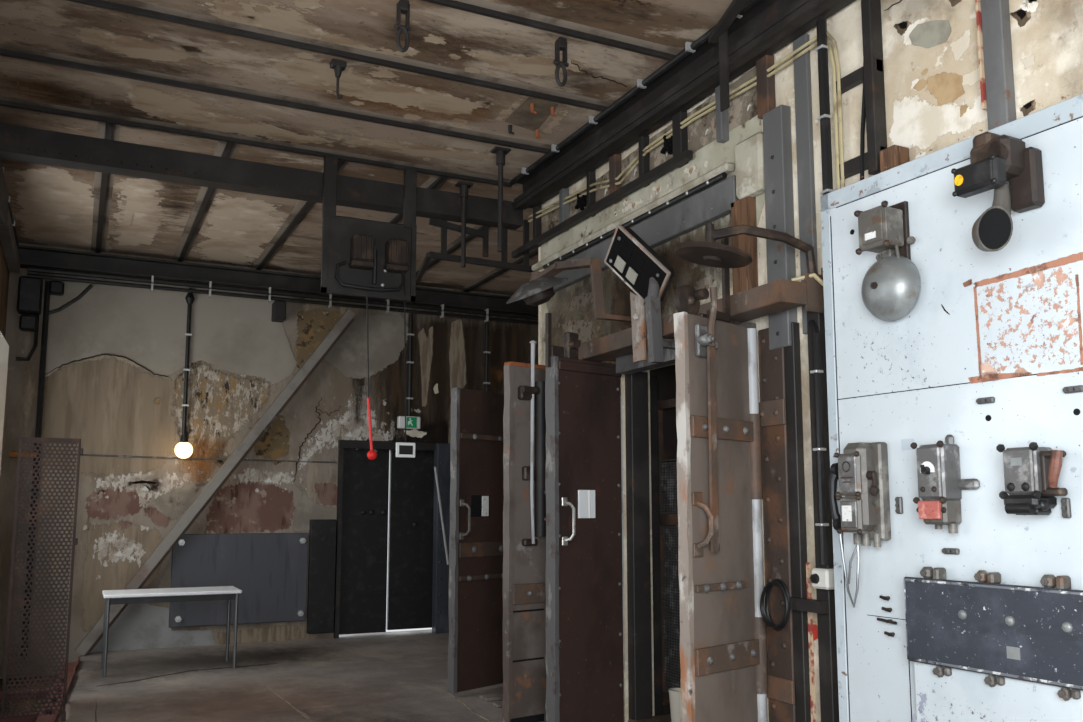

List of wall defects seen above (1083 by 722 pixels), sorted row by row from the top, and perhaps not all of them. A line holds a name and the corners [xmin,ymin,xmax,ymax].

spalling [894,21,911,36]
spalling [1010,0,1038,27]
damp [400,32,529,57]
damp [81,49,179,73]
damp [5,78,175,123]
damp [325,90,486,120]
peeling [888,29,1009,159]
spalling [1020,99,1036,116]
spalling [83,361,427,580]
crack [95,663,315,722]